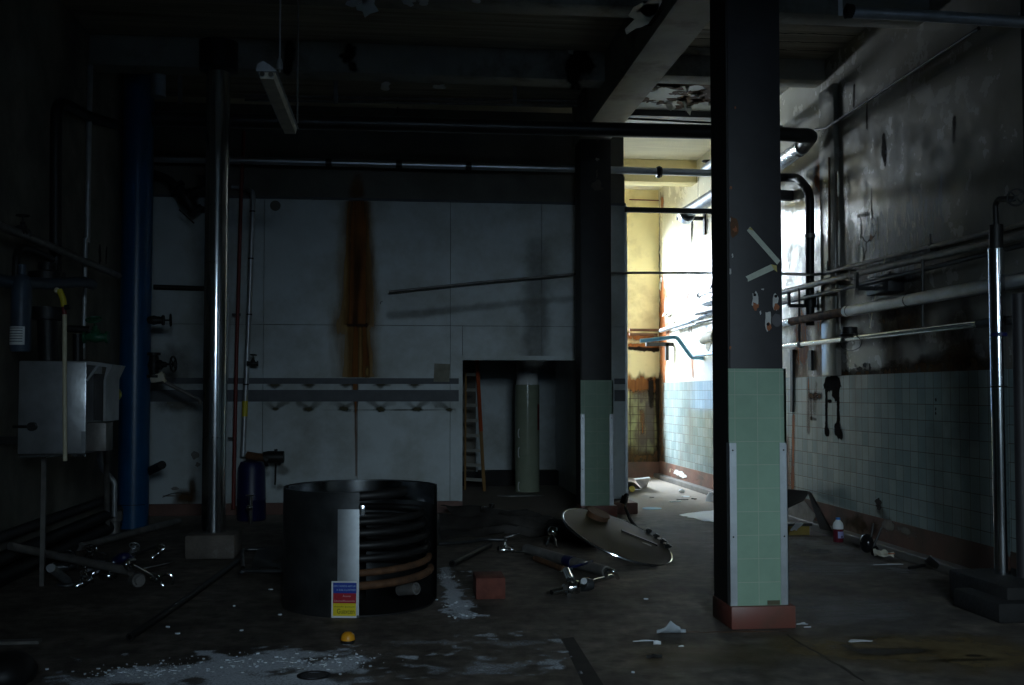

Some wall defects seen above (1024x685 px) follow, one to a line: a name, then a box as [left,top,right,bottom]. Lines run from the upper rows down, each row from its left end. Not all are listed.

peeling [625,0,662,35]
peeling [642,83,711,115]
rust [334,186,375,460]
rust [627,276,669,383]
water stain [628,373,665,462]